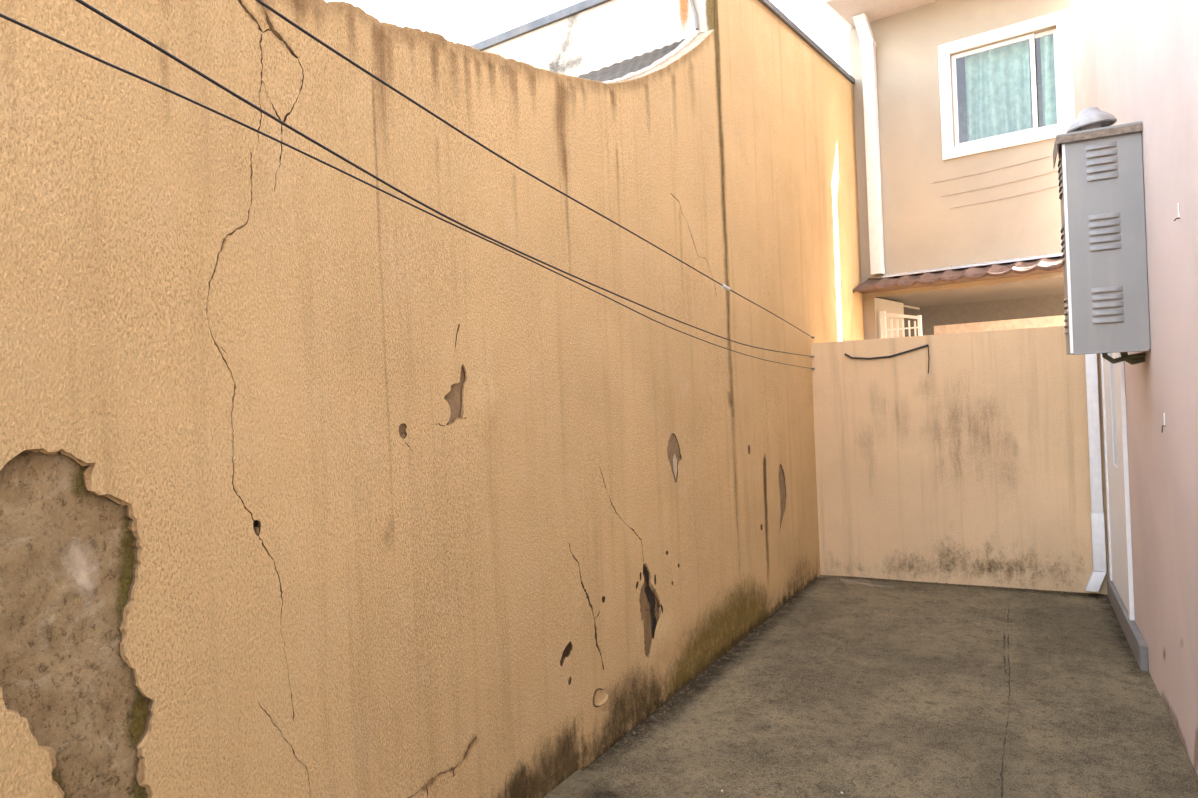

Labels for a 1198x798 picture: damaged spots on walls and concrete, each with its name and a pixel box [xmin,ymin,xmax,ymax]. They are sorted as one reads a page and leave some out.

rust [680,0,688,22]
leakage [554,45,579,125]
crack [207,0,311,798]
spalling [444,364,467,426]
crack [599,466,644,562]
spalling [0,448,155,798]
spalling [560,641,573,685]
crack [569,543,604,670]
spalling [636,563,663,658]
leakage [587,578,821,769]
leakage [959,584,1132,655]
crack [408,735,478,798]